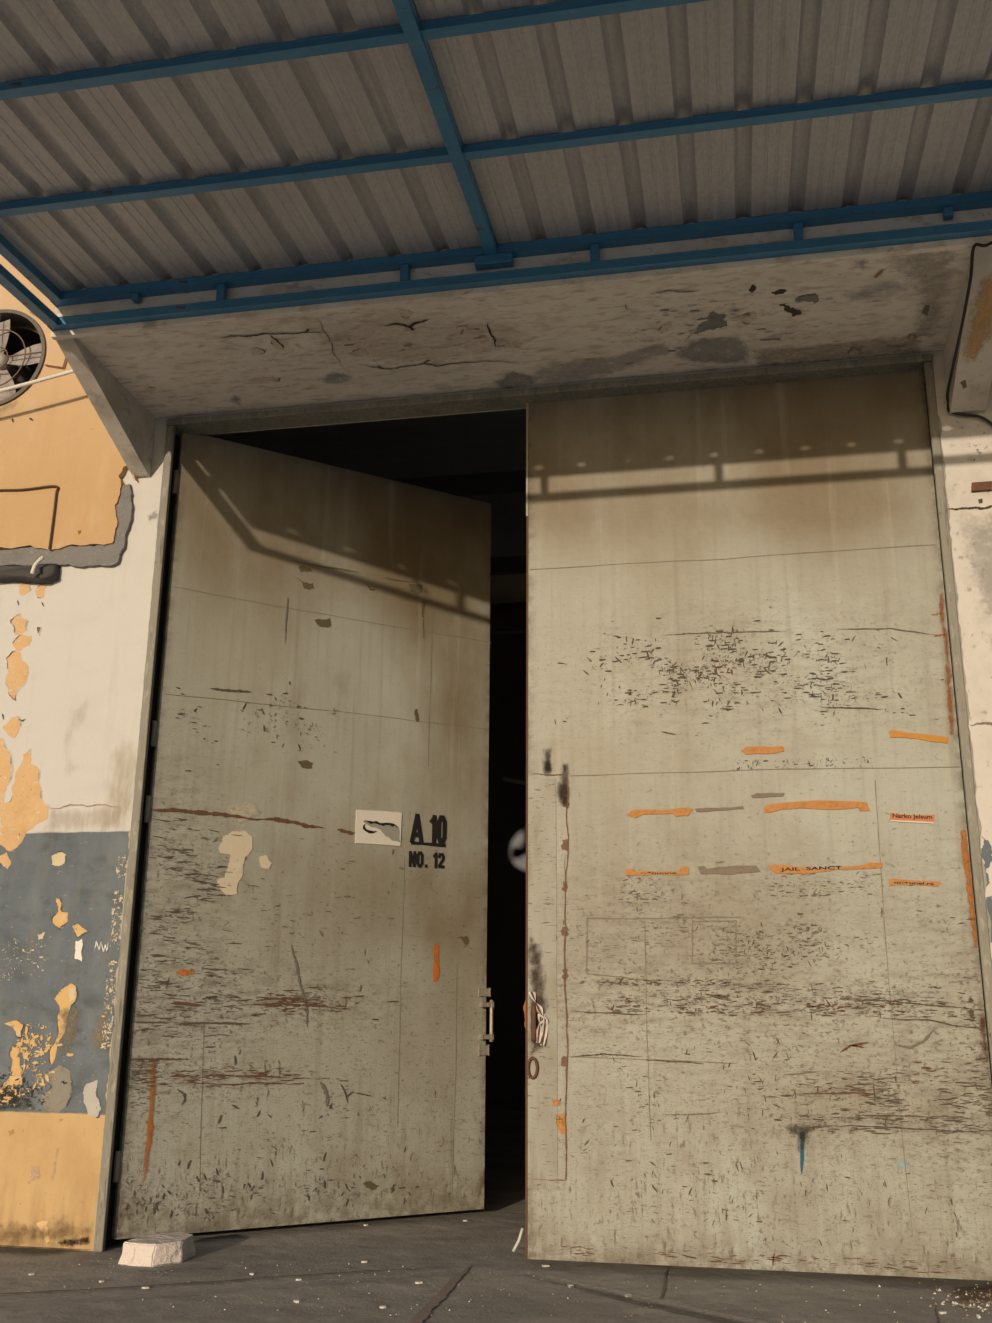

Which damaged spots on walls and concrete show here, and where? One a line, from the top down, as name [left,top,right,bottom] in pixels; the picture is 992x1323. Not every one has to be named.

crack [222,319,512,370]
water stain [679,338,745,363]
peeling [0,613,49,869]
peeling [52,850,67,866]
peeling [0,897,90,980]
peeling [100,855,127,1050]
flaking render [0,978,101,1118]